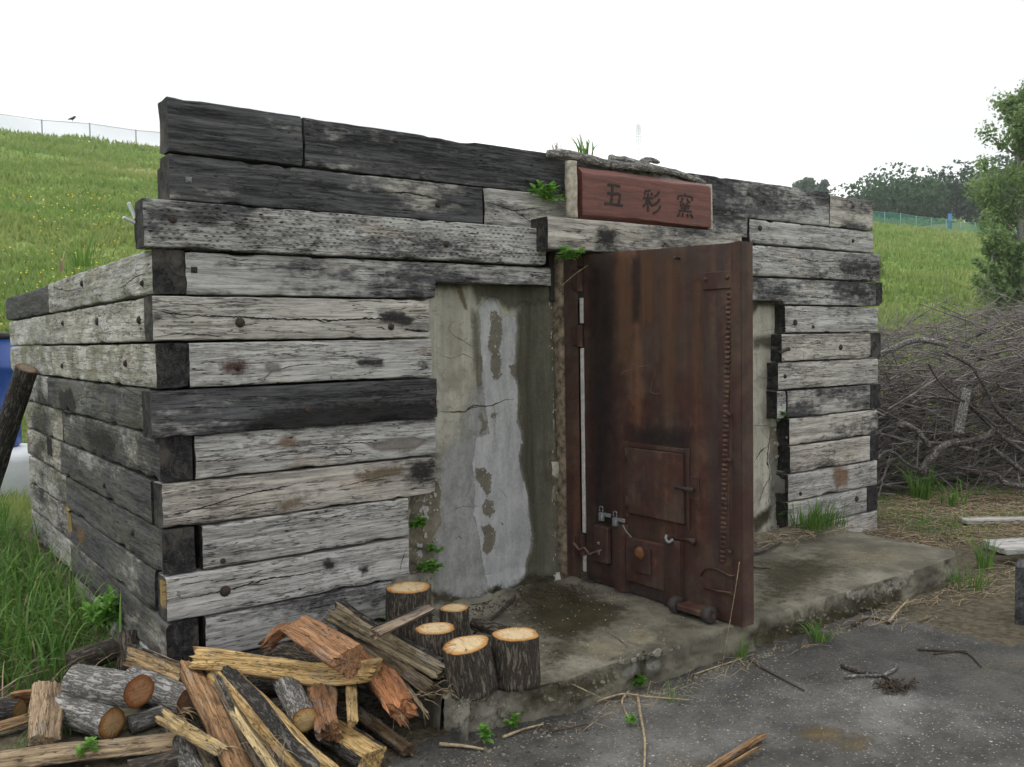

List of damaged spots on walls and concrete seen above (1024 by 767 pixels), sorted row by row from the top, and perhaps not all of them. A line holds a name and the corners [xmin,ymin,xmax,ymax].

peeling [476,309,517,386]
crack [439,399,514,413]
peeling [474,468,497,559]
water stain [367,283,655,708]